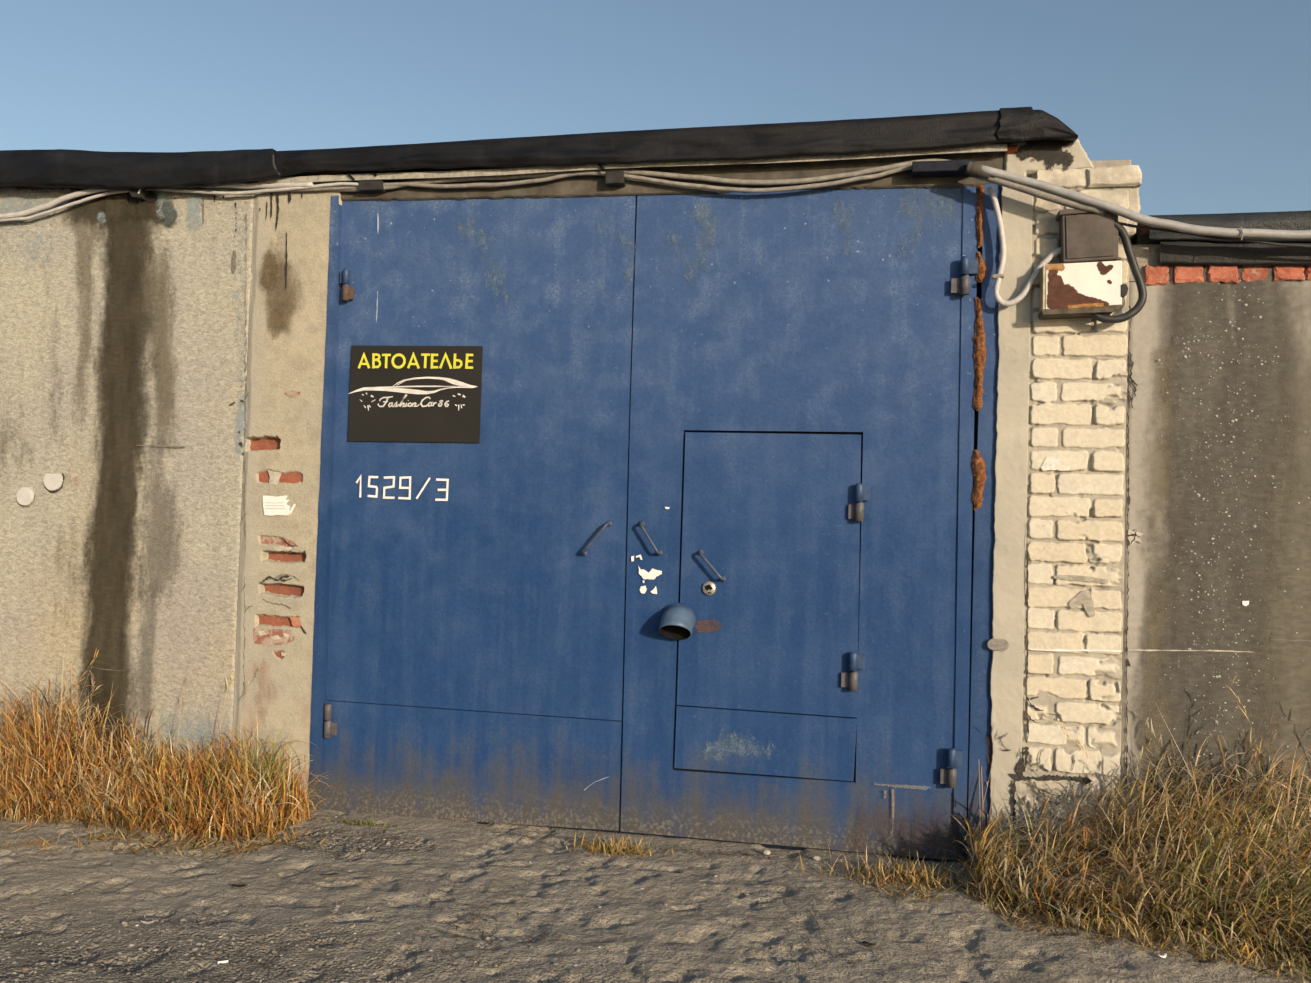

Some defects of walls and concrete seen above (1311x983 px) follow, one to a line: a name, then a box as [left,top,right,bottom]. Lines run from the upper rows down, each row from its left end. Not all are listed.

damp [261,233,295,335]
damp [68,191,179,766]
spalling [259,470,303,485]
spalling [253,536,307,659]
damp [1137,265,1311,863]